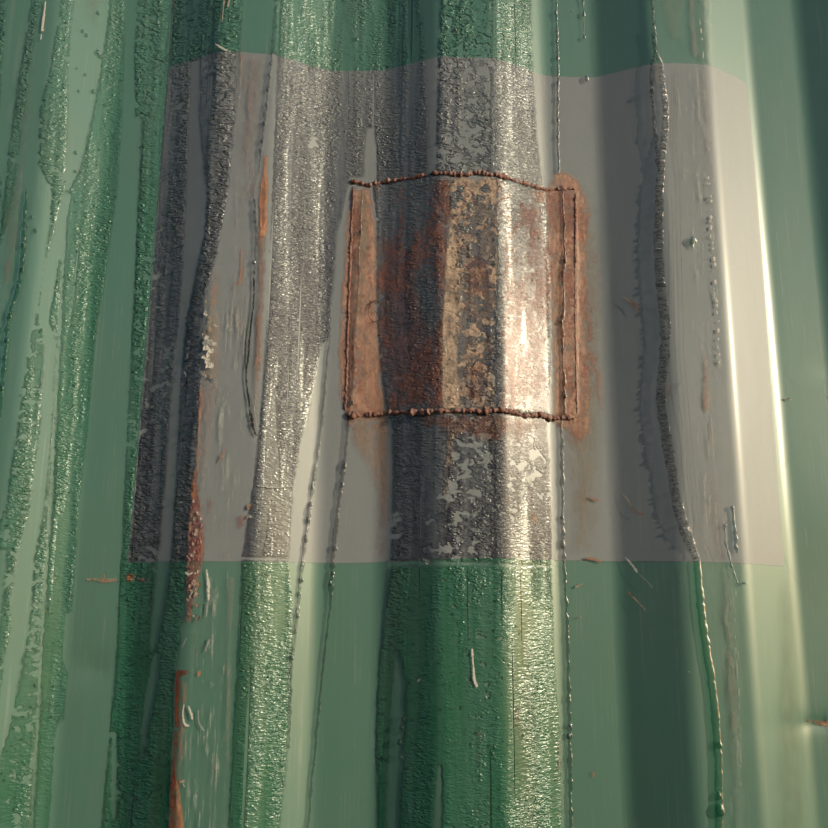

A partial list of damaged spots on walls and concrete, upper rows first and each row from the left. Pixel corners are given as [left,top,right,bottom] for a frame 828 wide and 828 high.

peeling [201,300,218,380]
corrosion [256,155,268,365]
corrosion [339,174,594,439]
corrosion [186,444,204,622]
corrosion [169,670,201,828]